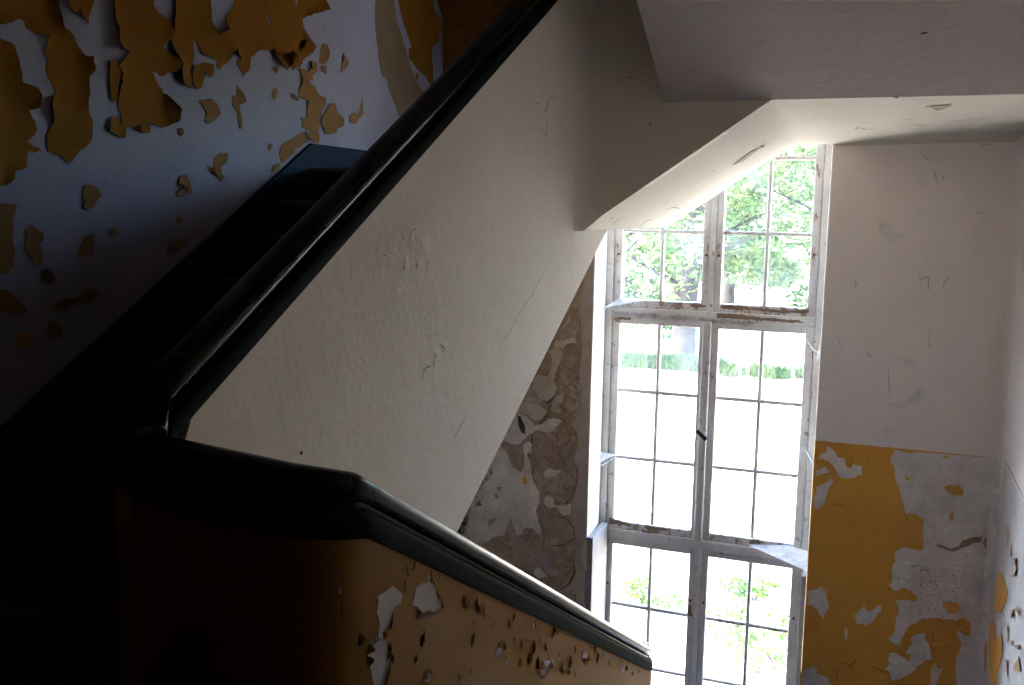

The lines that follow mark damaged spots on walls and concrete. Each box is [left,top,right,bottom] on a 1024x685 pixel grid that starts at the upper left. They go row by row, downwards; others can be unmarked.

peeling [0,0,96,186]
peeling [109,0,364,172]
spalling [375,0,445,117]
peeling [206,153,228,182]
peeling [0,203,55,284]
spalling [475,272,587,602]
peeling [813,446,862,511]
peeling [358,561,444,685]
peeling [495,613,639,680]
peeling [806,587,830,620]
peeling [844,603,882,639]
peeling [884,449,1020,685]